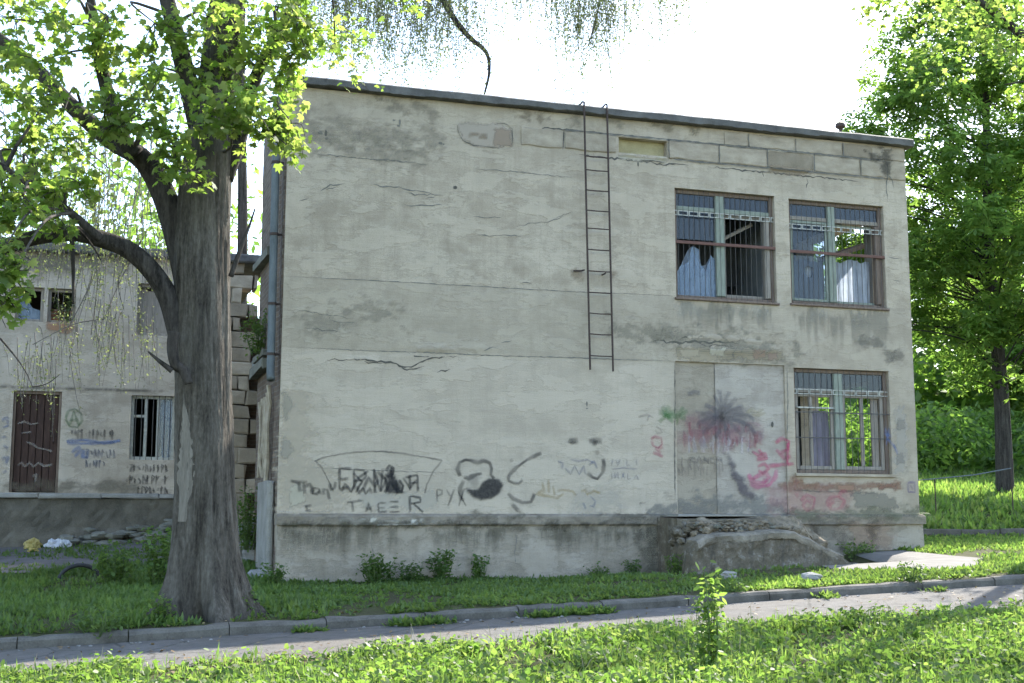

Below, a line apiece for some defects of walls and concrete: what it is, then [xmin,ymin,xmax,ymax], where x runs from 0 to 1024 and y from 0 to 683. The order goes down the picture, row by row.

spalling [457,122,513,148]
crack [318,154,441,207]
crack [715,167,853,188]
crack [475,213,569,237]
crack [290,310,738,478]
spalling [779,482,901,494]